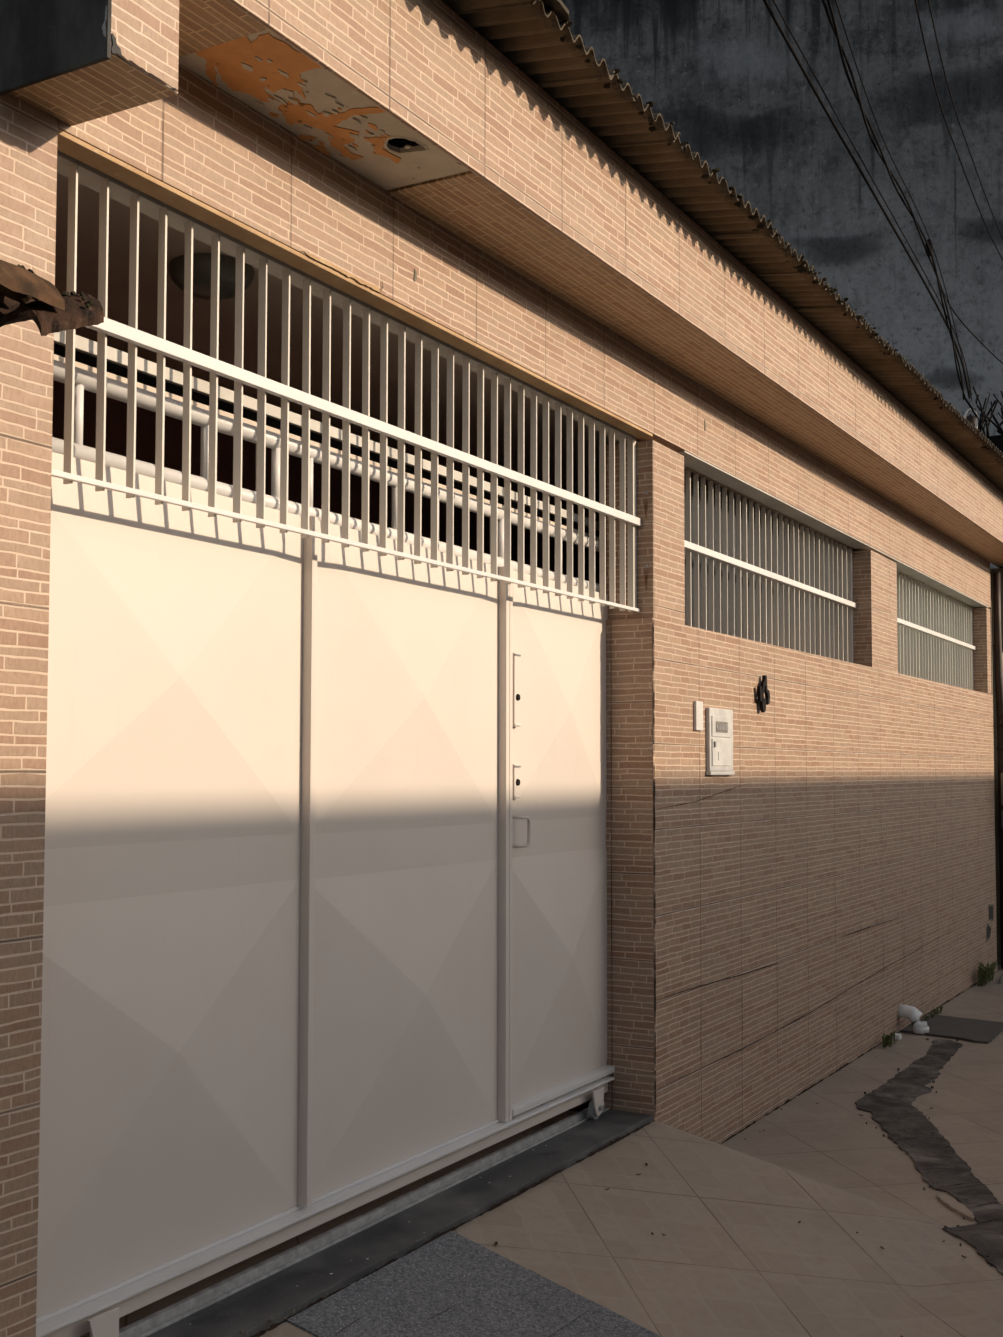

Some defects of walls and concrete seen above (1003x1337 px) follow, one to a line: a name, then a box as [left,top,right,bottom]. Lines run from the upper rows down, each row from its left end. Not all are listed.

peeling [179,29,469,192]